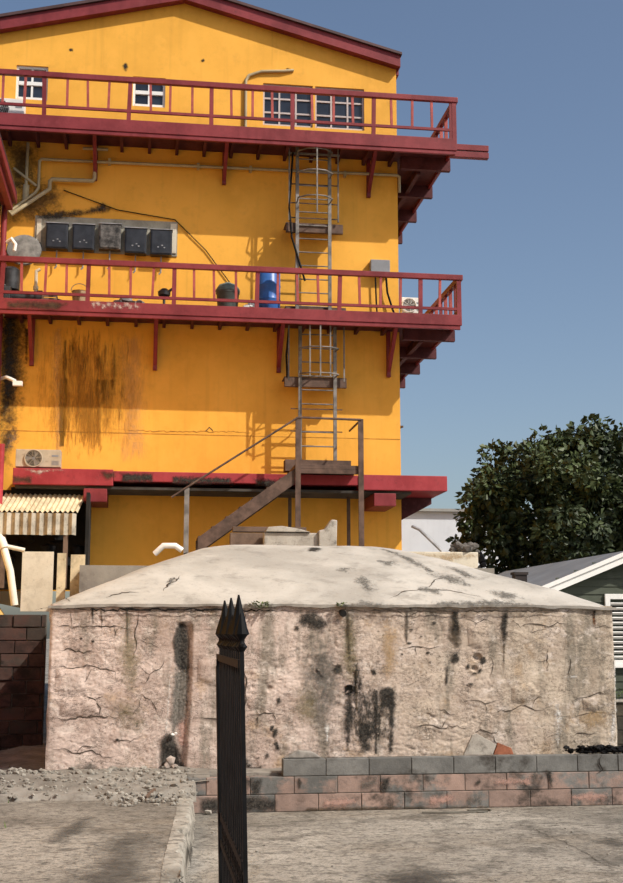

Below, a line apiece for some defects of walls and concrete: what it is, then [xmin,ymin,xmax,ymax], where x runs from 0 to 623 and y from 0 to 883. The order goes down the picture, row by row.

damp [10,145,33,188]
damp [1,314,28,444]
crack [53,648,134,758]
damp [160,623,189,766]
crack [36,577,611,719]
damp [344,602,395,754]
damp [378,549,530,684]
crack [411,697,548,744]
crack [574,692,610,736]